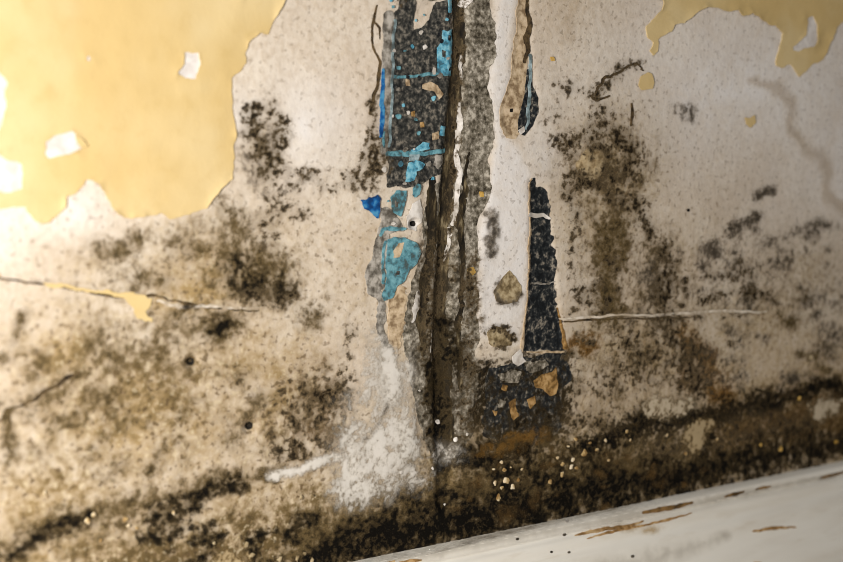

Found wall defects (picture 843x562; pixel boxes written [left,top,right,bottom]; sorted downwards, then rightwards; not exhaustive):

peeling [646,0,843,77]
peeling [0,0,285,224]
leakage [166,94,393,310]
spalling [361,0,579,456]
crack [0,278,260,322]
leakage [140,304,244,362]
leakage [234,104,843,562]
crack [559,309,767,323]
leakage [1,326,152,465]
leakage [0,468,250,562]
spalling [492,460,523,501]
spalling [556,442,599,477]